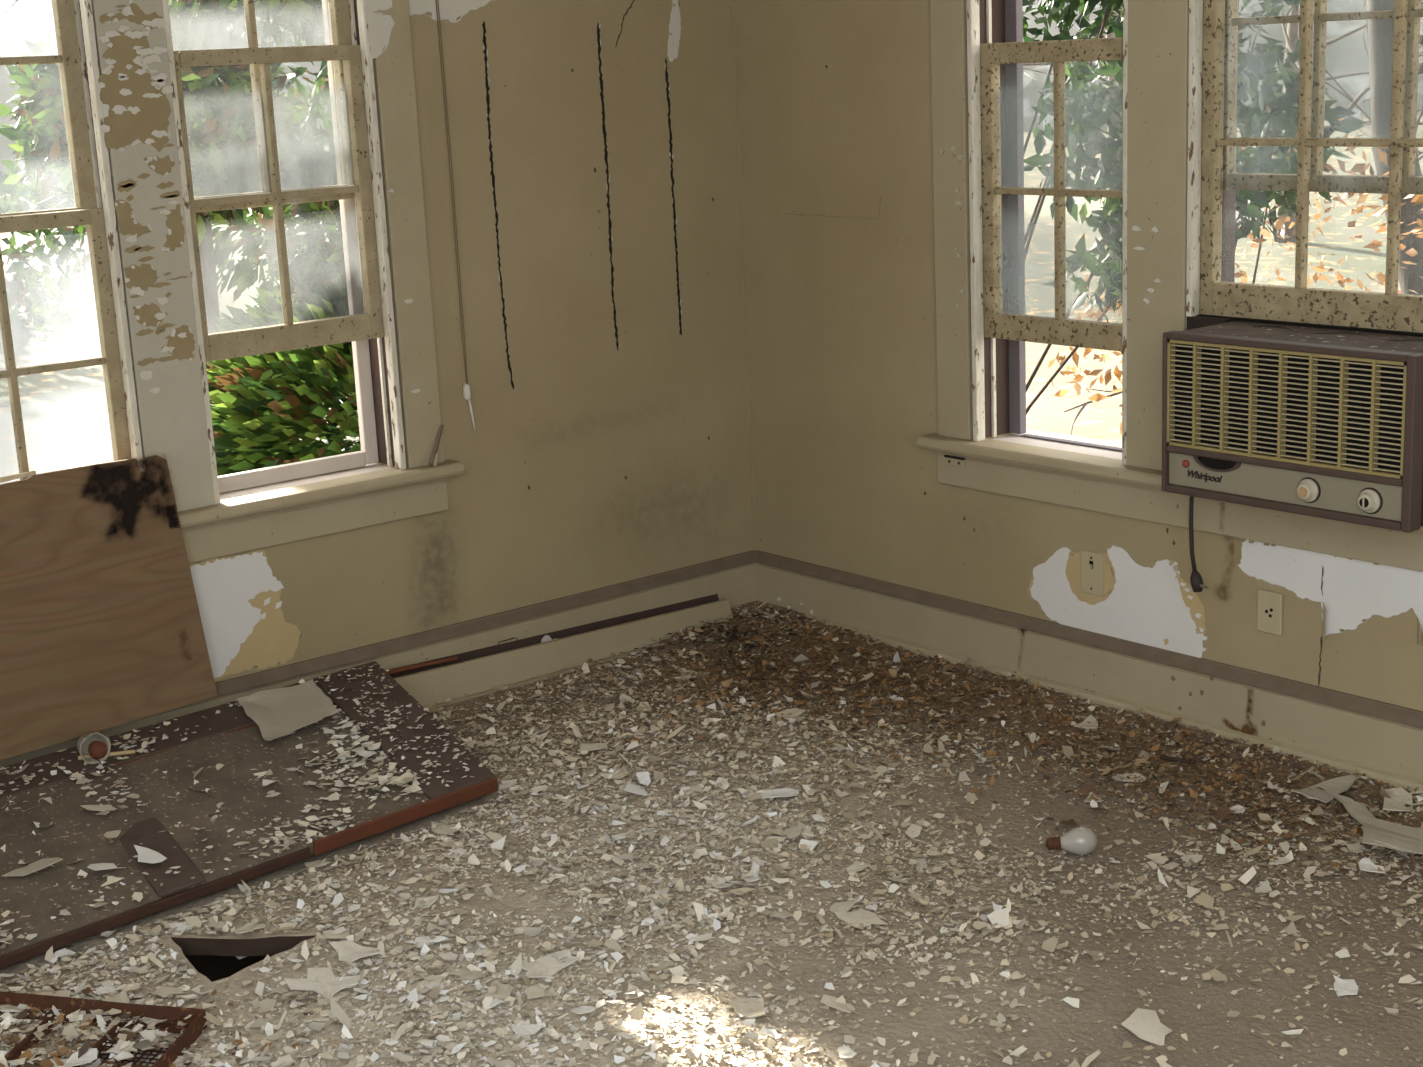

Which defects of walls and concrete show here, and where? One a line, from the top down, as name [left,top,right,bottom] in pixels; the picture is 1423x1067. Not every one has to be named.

peeling [365,0,491,59]
peeling [98,0,195,393]
crack [482,21,514,389]
crack [597,0,635,350]
crack [664,58,682,335]
peeling [189,550,303,681]
peeling [1028,545,1208,658]
peeling [1233,538,1423,647]